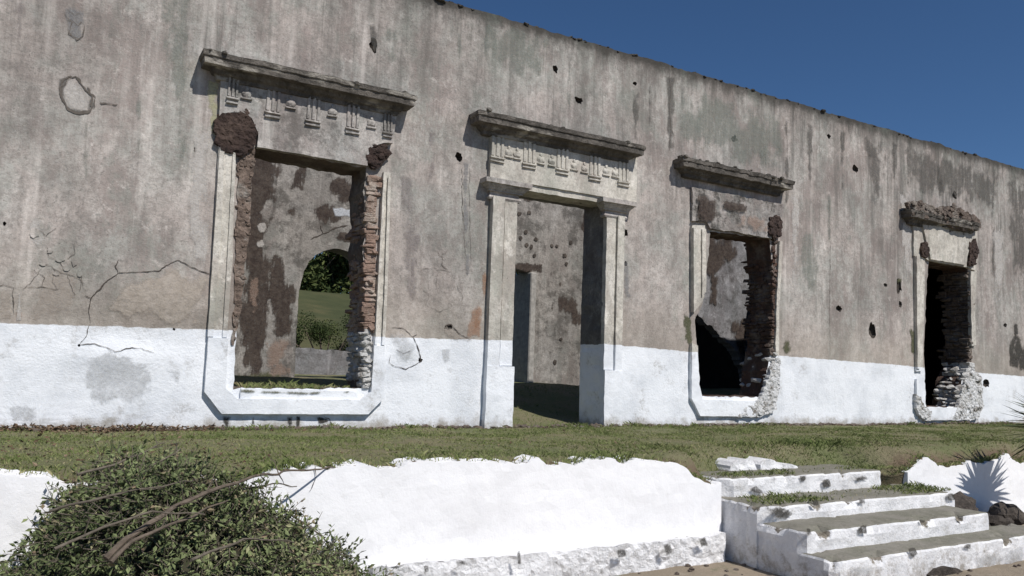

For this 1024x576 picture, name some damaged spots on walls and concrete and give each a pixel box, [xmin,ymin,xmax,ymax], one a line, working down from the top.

peeling [63,80,88,110]
crack [0,228,211,353]
spalling [213,108,266,346]
water stain [239,158,296,376]
water stain [291,168,306,190]
water stain [314,178,351,242]
spalling [333,144,392,389]
crack [389,327,421,370]
water stain [706,238,737,305]
water stain [698,195,747,221]
spalling [738,215,783,419]
spalling [904,192,989,421]